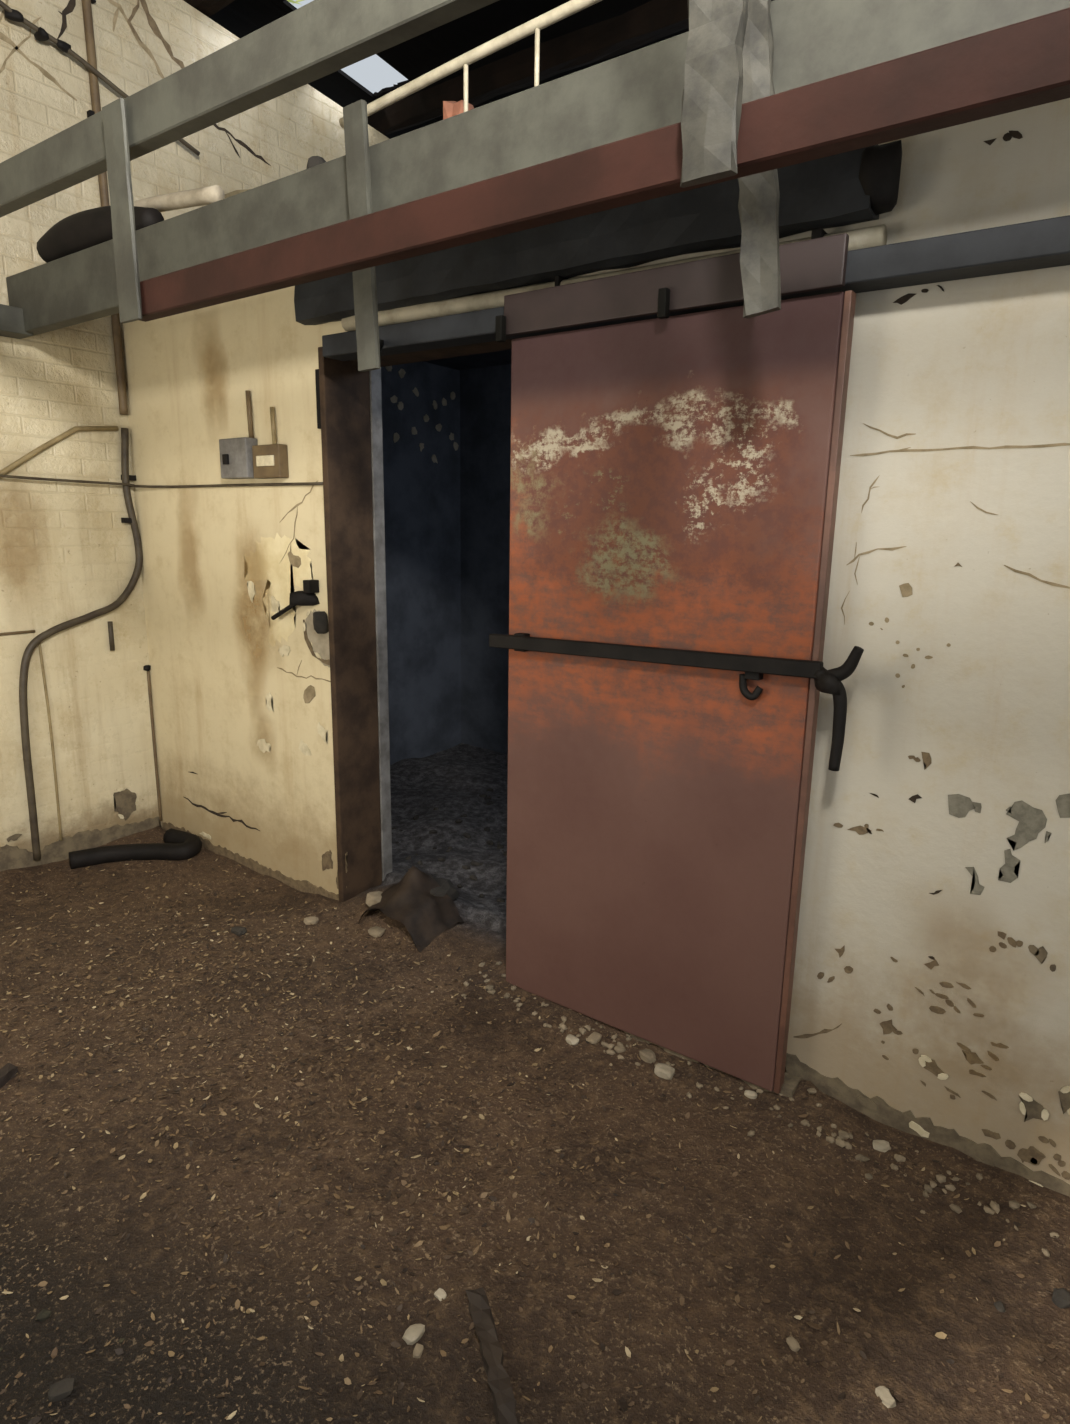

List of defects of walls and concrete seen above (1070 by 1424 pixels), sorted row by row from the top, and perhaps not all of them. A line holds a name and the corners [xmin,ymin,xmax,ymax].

crack [0,0,184,101]
crack [214,124,271,166]
leakage [241,587,264,665]
spalling [0,788,348,900]
spalling [833,823,884,835]
spalling [948,794,982,818]
spalling [965,793,1070,895]
spalling [989,931,1056,972]
spalling [915,956,985,1017]
spalling [873,1004,903,1060]
spalling [957,1042,1009,1101]
spalling [785,1048,1070,1197]